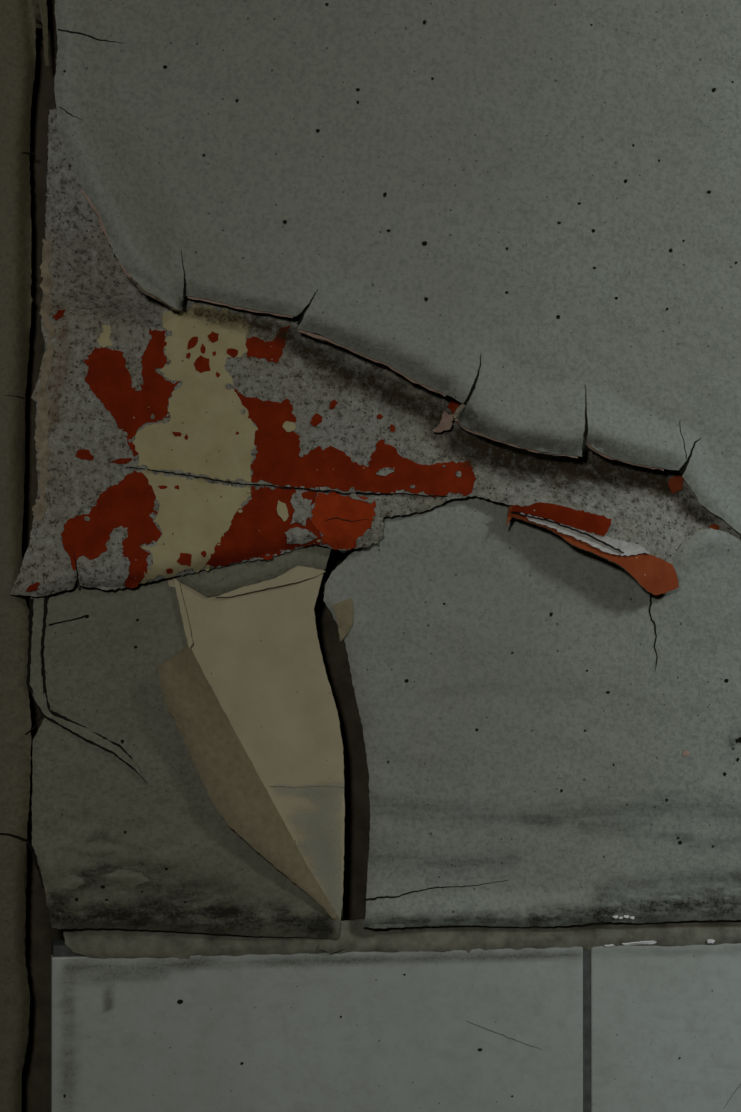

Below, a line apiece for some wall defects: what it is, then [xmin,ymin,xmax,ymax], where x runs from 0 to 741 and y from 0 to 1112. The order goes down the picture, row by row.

crack [58,29,124,43]
peeling [54,0,741,535]
crack [130,467,447,522]
flaking render [10,108,741,920]
crack [649,594,658,672]
crack [25,597,147,783]
leakage [43,886,333,936]
leakage [529,896,741,925]